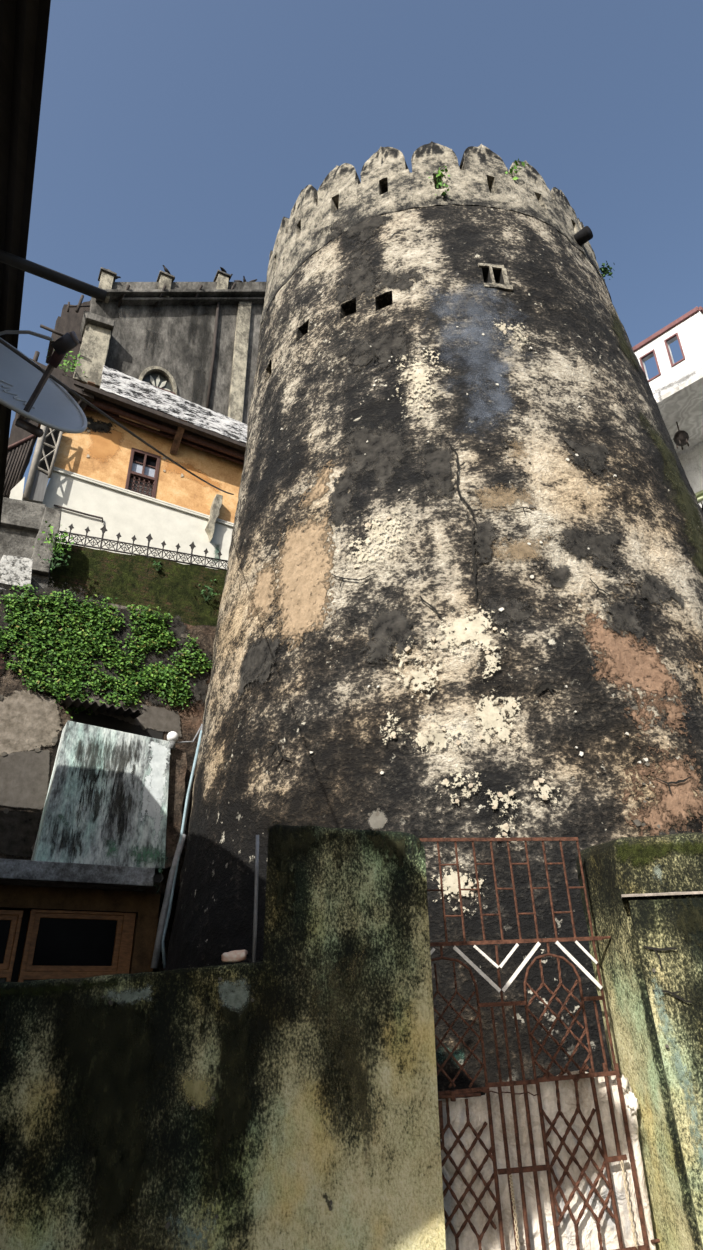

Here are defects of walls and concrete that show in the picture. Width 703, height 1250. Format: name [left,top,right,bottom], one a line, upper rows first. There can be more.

water stain [188,305,211,404]
water stain [348,326,458,421]
water stain [482,318,537,354]
peeling [246,460,339,652]
water stain [329,440,416,581]
water stain [425,473,463,498]
water stain [560,537,621,574]
water stain [359,605,561,842]
peeling [580,579,703,837]
water stain [52,735,139,863]
water stain [48,989,172,1250]
water stain [199,978,263,1194]